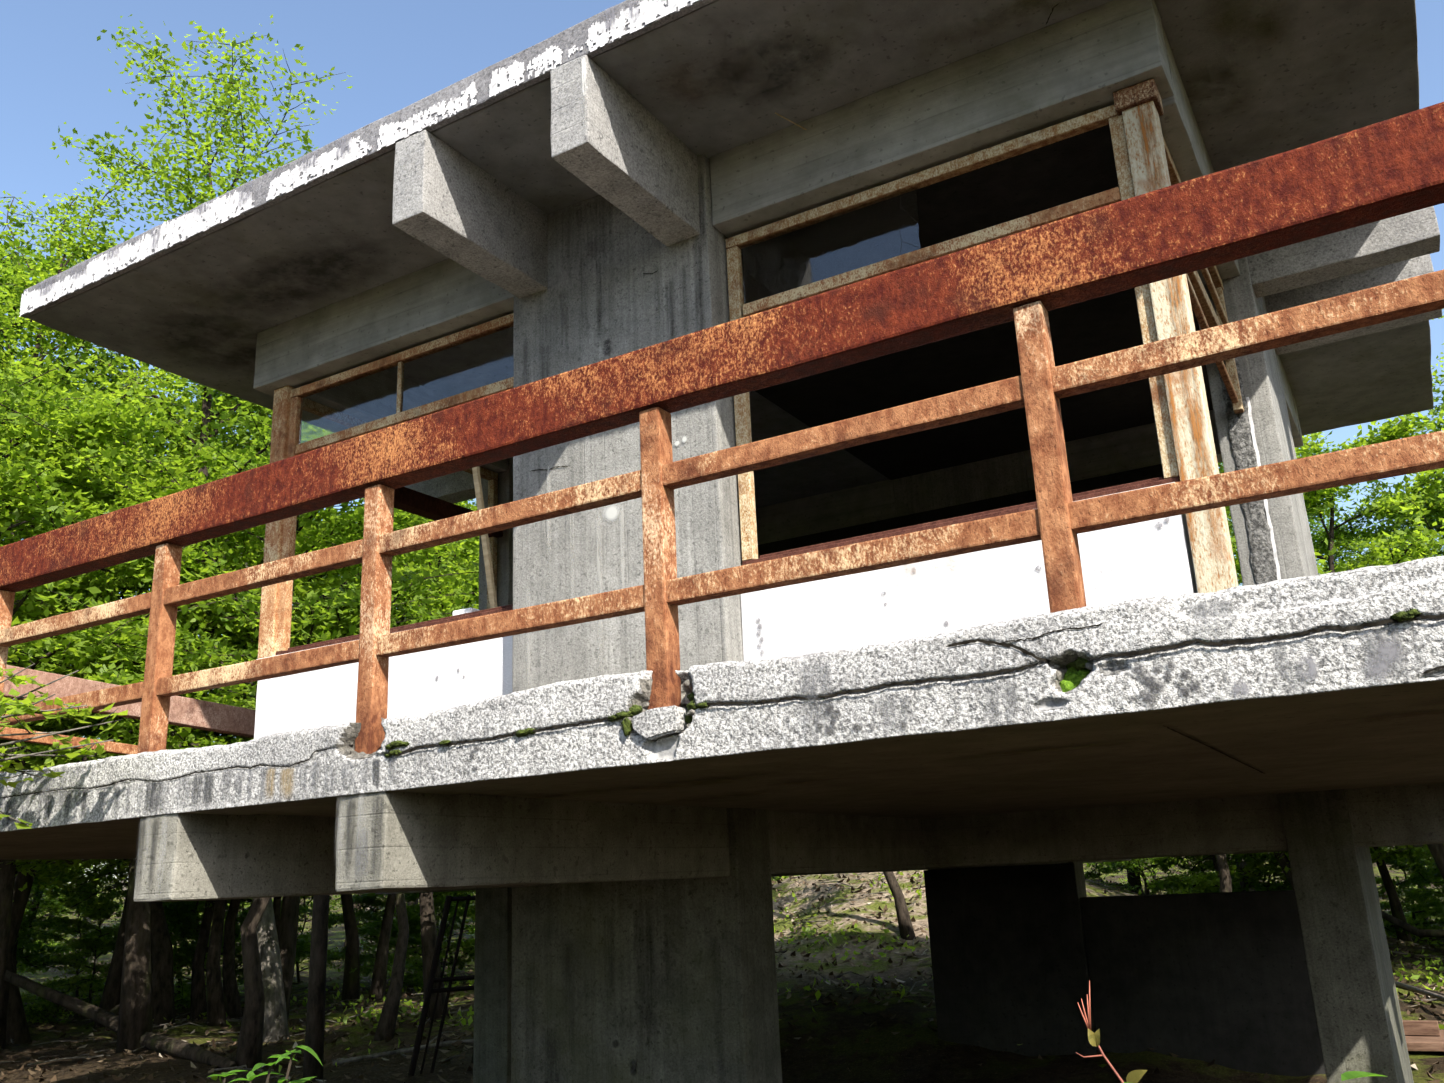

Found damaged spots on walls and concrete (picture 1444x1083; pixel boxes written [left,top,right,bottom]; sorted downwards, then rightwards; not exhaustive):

peeling [19,0,698,317]
corrosion [1137,102,1160,183]
corrosion [1168,276,1189,335]
corrosion [1167,367,1211,481]
crack [1,747,334,798]
spalling [336,717,386,760]
crack [381,717,610,755]
spalling [623,675,695,760]
crack [696,614,1444,707]
spalling [1037,653,1128,711]